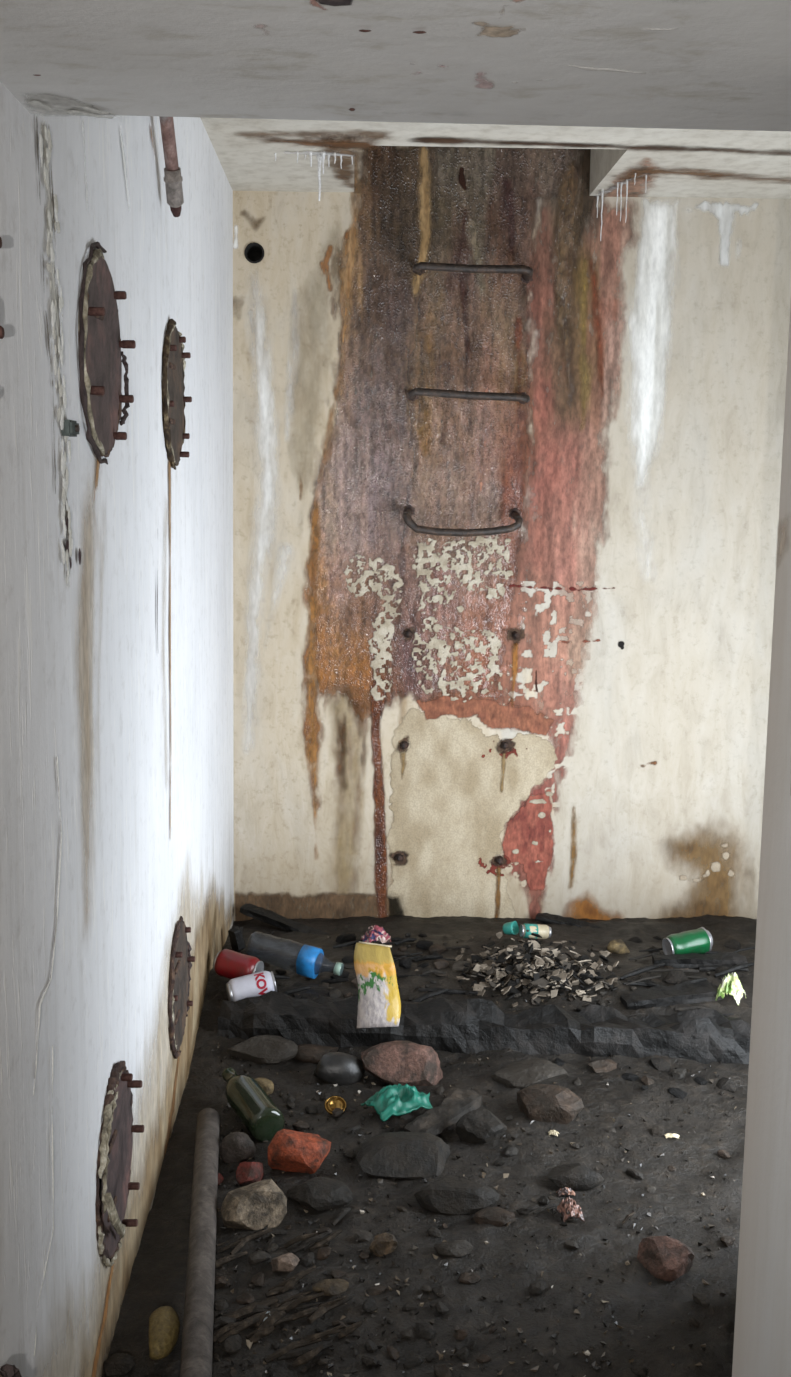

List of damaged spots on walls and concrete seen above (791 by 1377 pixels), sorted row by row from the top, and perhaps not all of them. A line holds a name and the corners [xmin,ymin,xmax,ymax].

corrosion [242,132,386,188]
peeling [458,167,467,190]
water stain [697,201,758,265]
water stain [630,202,675,476]
corrosion [413,138,791,920]
corrosion [397,737,409,775]
peeling [344,535,558,918]
corrosion [390,851,408,865]
water stain [664,832,735,918]
corrosion [44,885,234,1377]